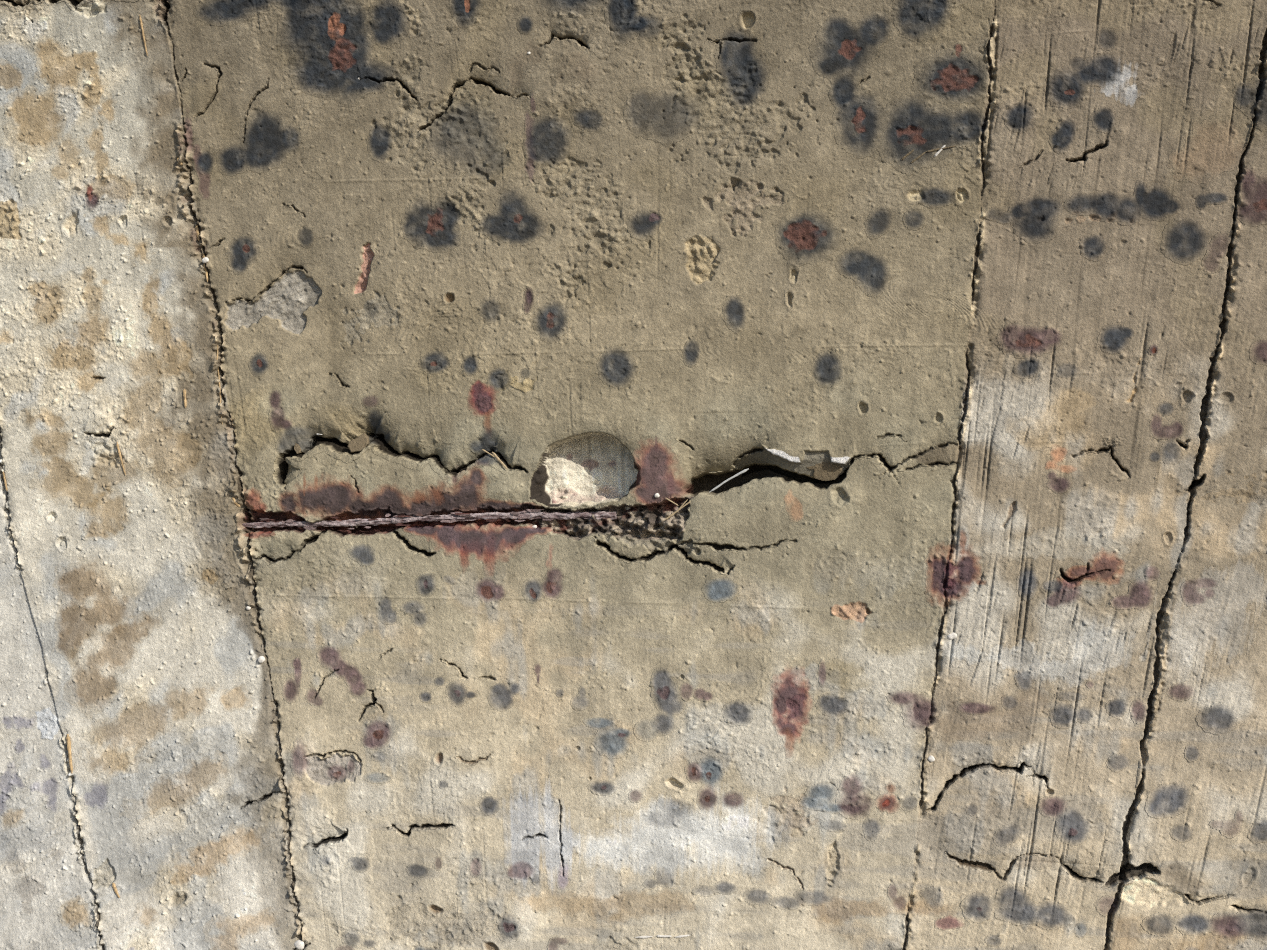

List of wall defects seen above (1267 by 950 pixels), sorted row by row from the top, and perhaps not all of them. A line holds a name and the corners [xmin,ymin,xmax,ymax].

corrosion [193,0,410,108]
crack [357,62,531,131]
spalling [224,270,322,335]
spalling [244,507,442,538]
corrosion [242,350,565,628]
spalling [461,431,700,555]
damp [932,557,1267,747]
corrosion [770,659,851,759]
crack [924,762,1049,813]
damp [502,769,789,923]
crack [945,851,1161,889]
damp [1103,913,1143,950]